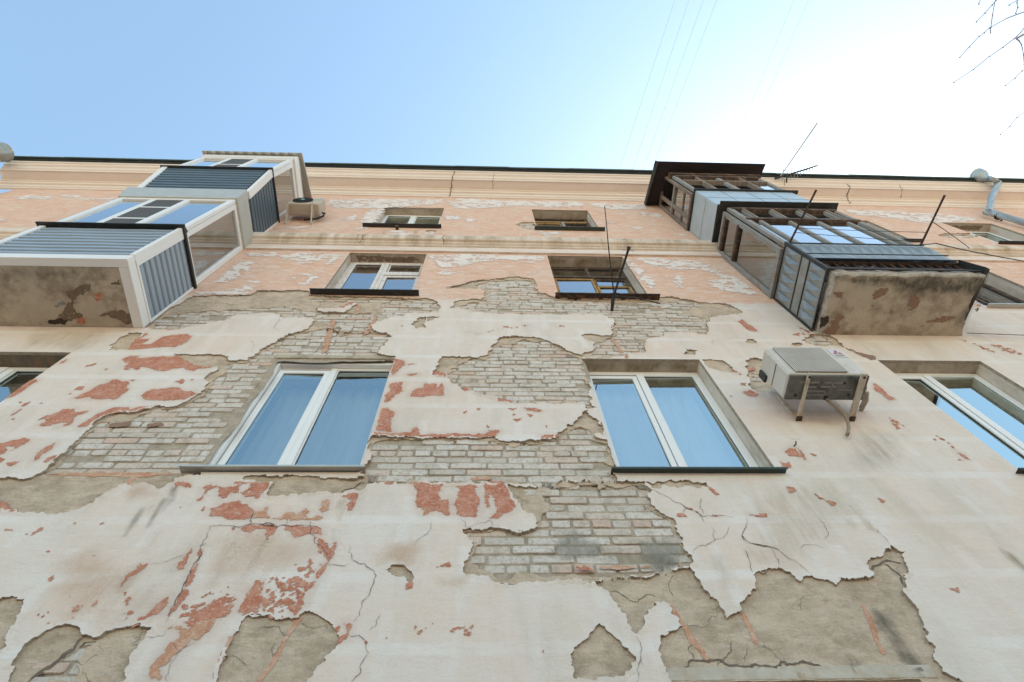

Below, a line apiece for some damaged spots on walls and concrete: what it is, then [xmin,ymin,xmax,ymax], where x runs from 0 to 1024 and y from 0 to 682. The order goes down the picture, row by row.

crack [148,515,379,681]
spalling [0,252,959,682]
crack [655,490,829,570]
crack [870,529,905,586]